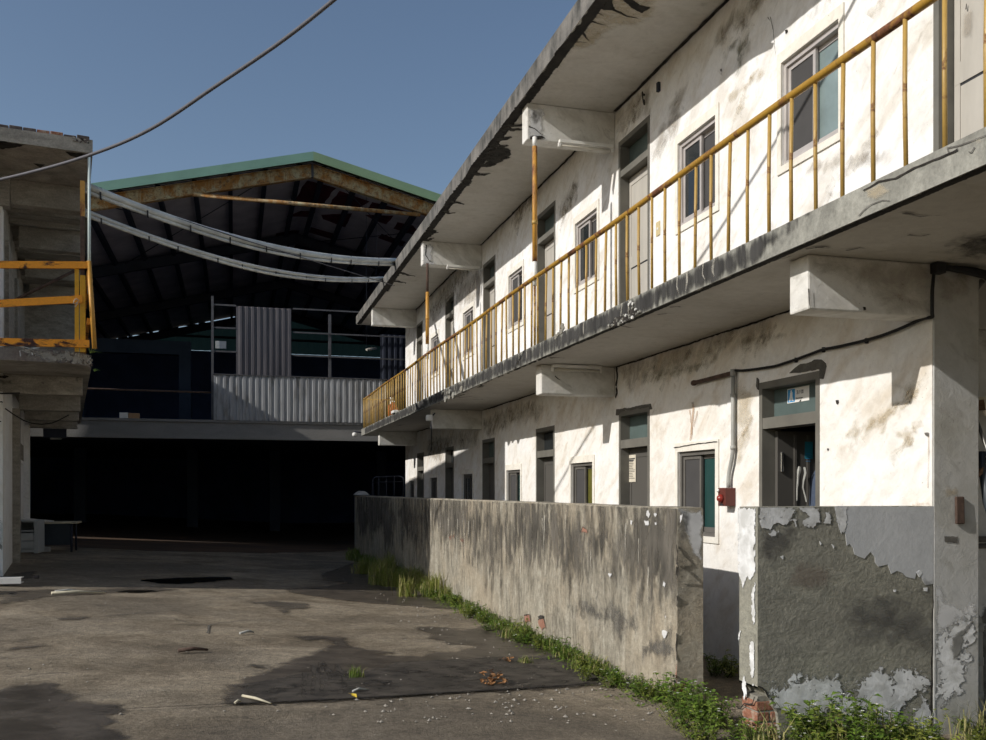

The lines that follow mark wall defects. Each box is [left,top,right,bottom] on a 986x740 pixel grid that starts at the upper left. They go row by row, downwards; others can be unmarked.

leakage [357,0,650,324]
leakage [362,166,986,436]
leakage [253,562,457,613]
leakage [357,497,703,602]
leakage [581,603,634,634]
leakage [643,634,671,655]
peeling [738,506,986,732]